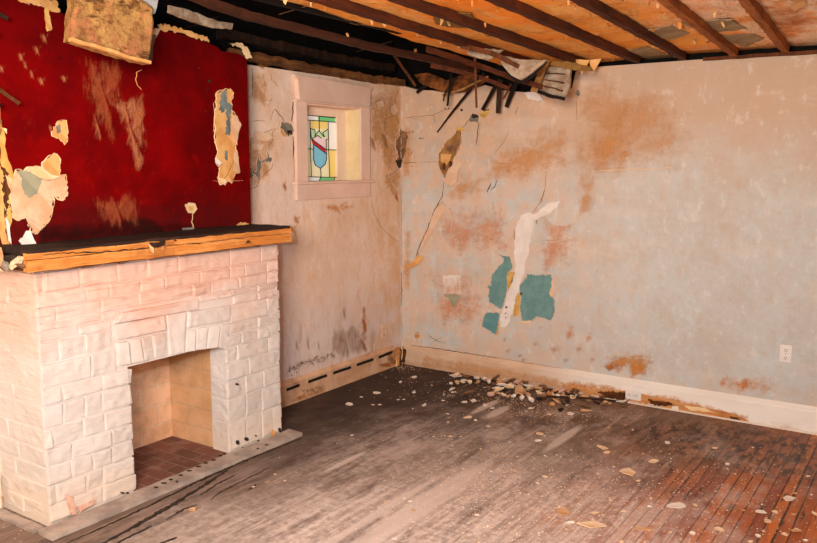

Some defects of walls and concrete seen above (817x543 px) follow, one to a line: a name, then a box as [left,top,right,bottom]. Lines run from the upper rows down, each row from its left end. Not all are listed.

peeling [0,118,68,245]
peeling [213,88,295,189]
crack [371,162,445,304]
flaking render [438,109,490,186]
peeling [533,201,560,221]
peeling [482,254,556,336]